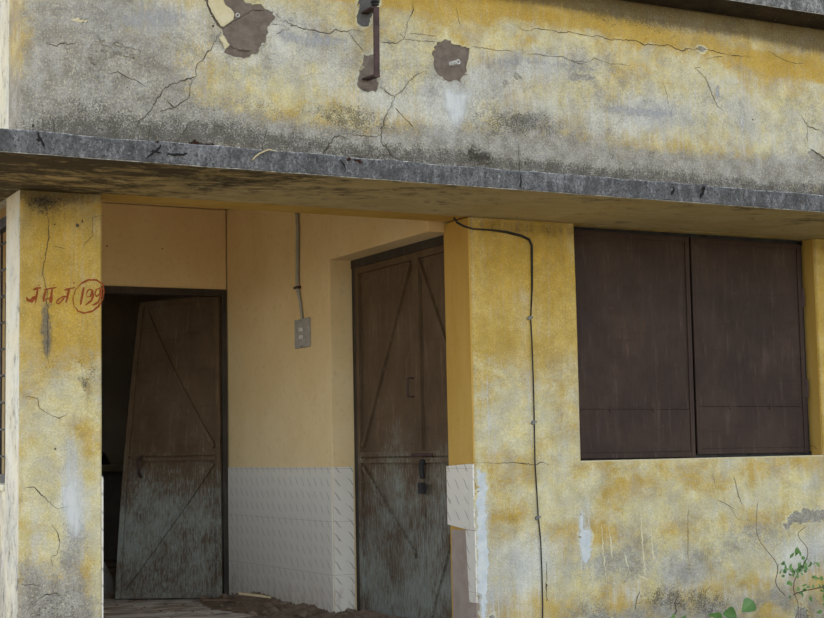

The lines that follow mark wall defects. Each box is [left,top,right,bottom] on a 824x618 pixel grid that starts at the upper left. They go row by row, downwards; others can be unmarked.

crack [108,32,221,159]
spalling [201,0,278,63]
crack [274,14,362,49]
crack [316,71,427,170]
crack [380,8,435,44]
spalling [429,37,472,86]
crack [518,26,804,109]
water stain [41,306,51,353]
crack [27,487,65,566]
peeling [473,466,497,618]
peeling [577,507,594,565]
peeling [780,506,824,532]